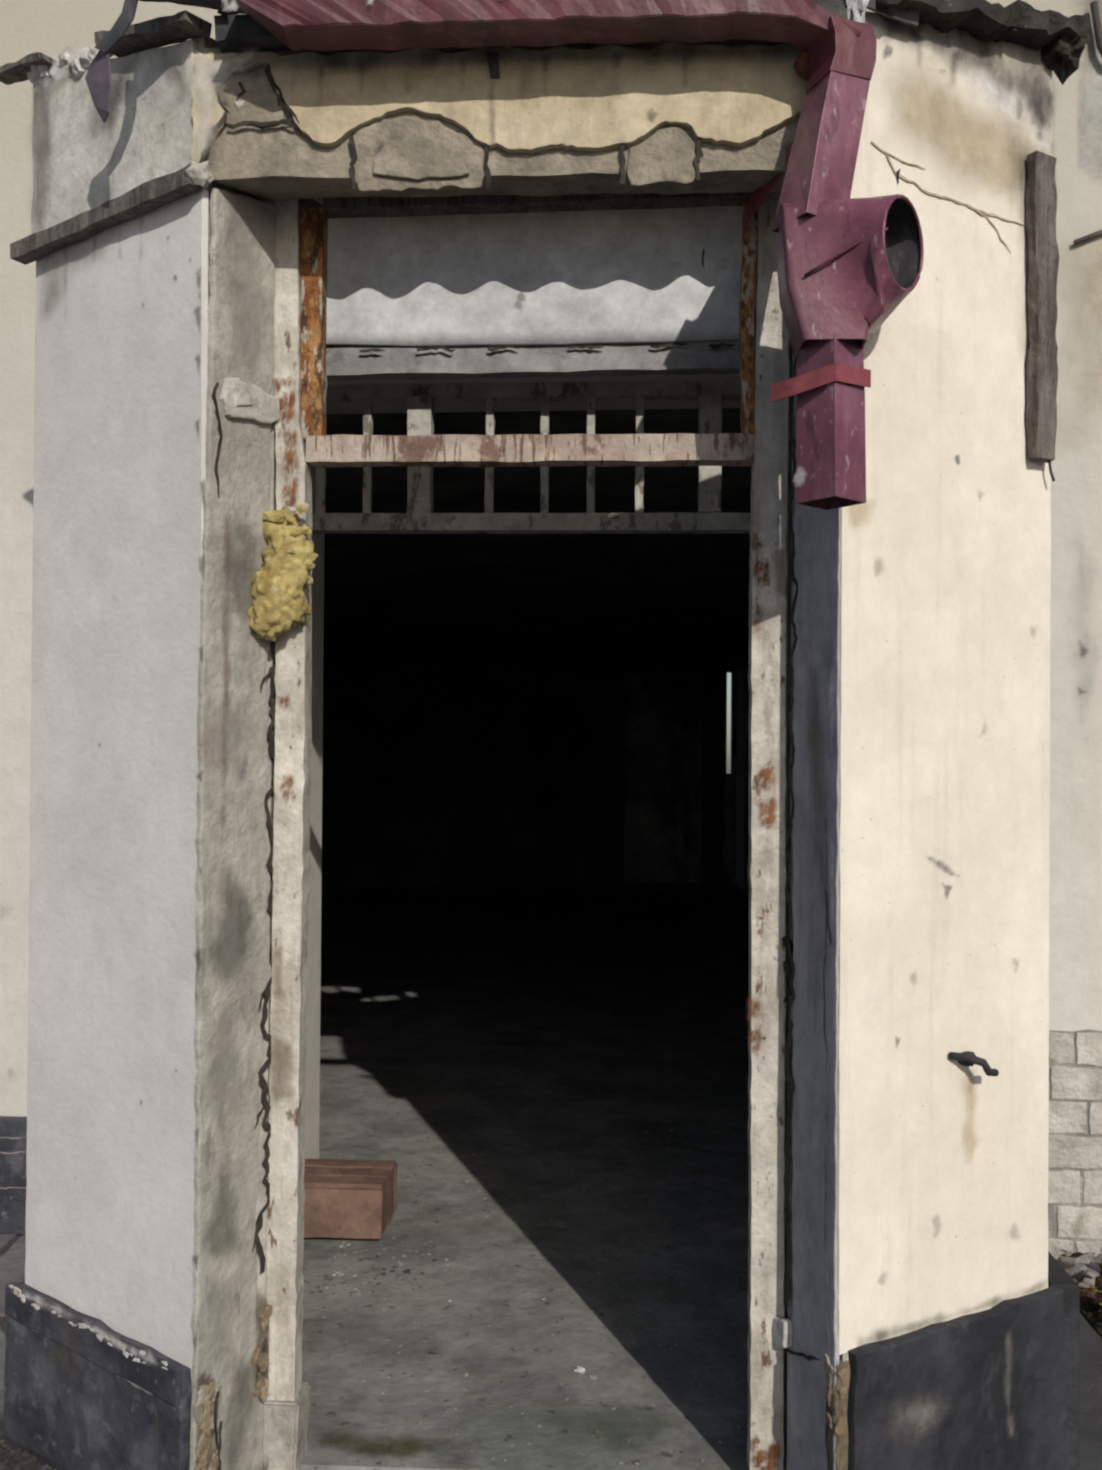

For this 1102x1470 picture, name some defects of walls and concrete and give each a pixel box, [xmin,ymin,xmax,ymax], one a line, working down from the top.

spalling [216,68,285,128]
spalling [353,115,485,193]
crack [871,141,1026,253]
rust [758,763,776,827]
crack [252,641,276,1273]
spalling [193,1375,221,1470]
rust [752,1436,779,1470]
spalling [823,1353,850,1470]